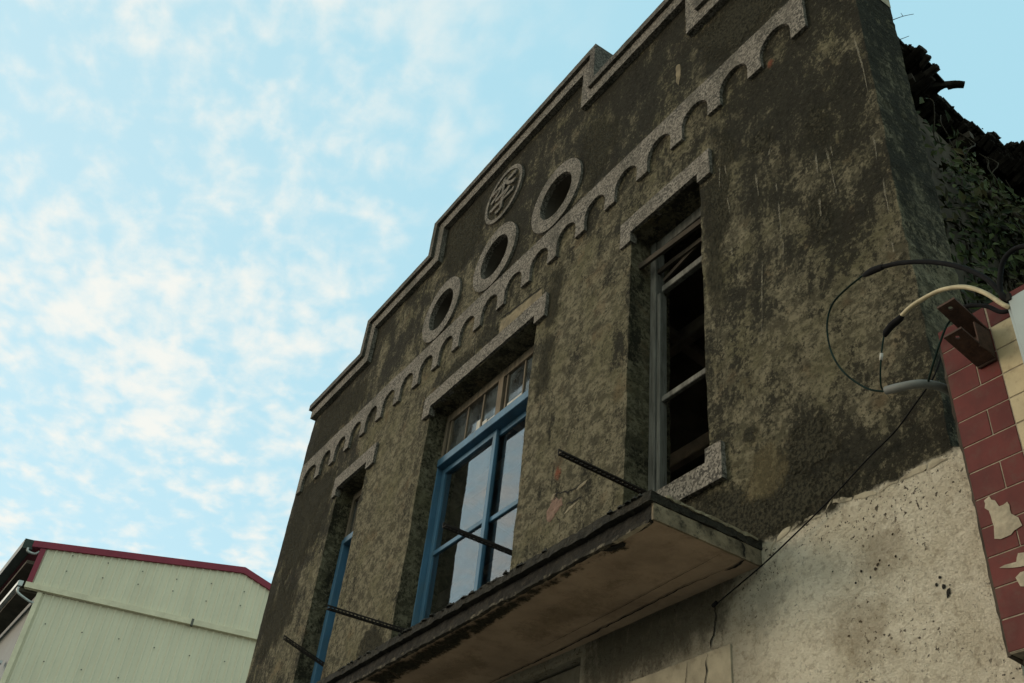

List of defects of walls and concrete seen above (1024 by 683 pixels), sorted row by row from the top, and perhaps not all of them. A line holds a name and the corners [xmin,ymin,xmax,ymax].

damp [703,412,857,540]
spalling [546,479,588,522]
spalling [984,497,1022,539]
spalling [1000,552,1024,586]
damp [356,618,382,656]
damp [366,564,583,683]